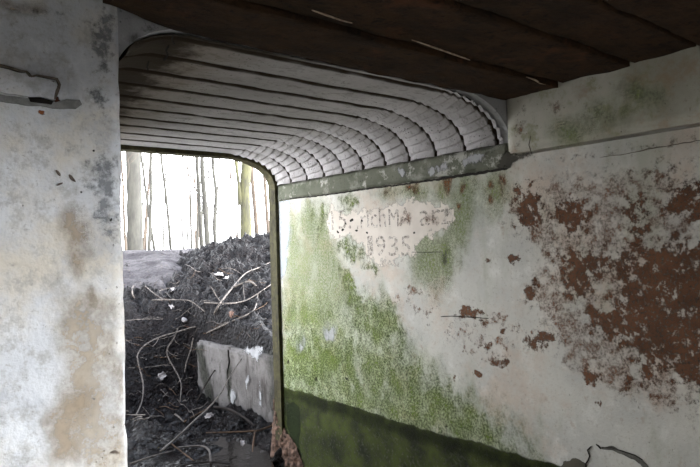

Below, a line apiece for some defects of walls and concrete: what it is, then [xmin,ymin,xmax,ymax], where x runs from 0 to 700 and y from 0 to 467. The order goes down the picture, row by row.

spalling [0,64,82,115]
crack [600,140,700,158]
water stain [279,200,290,277]
water stain [323,325,336,341]
water stain [284,387,560,467]
crack [585,444,649,467]